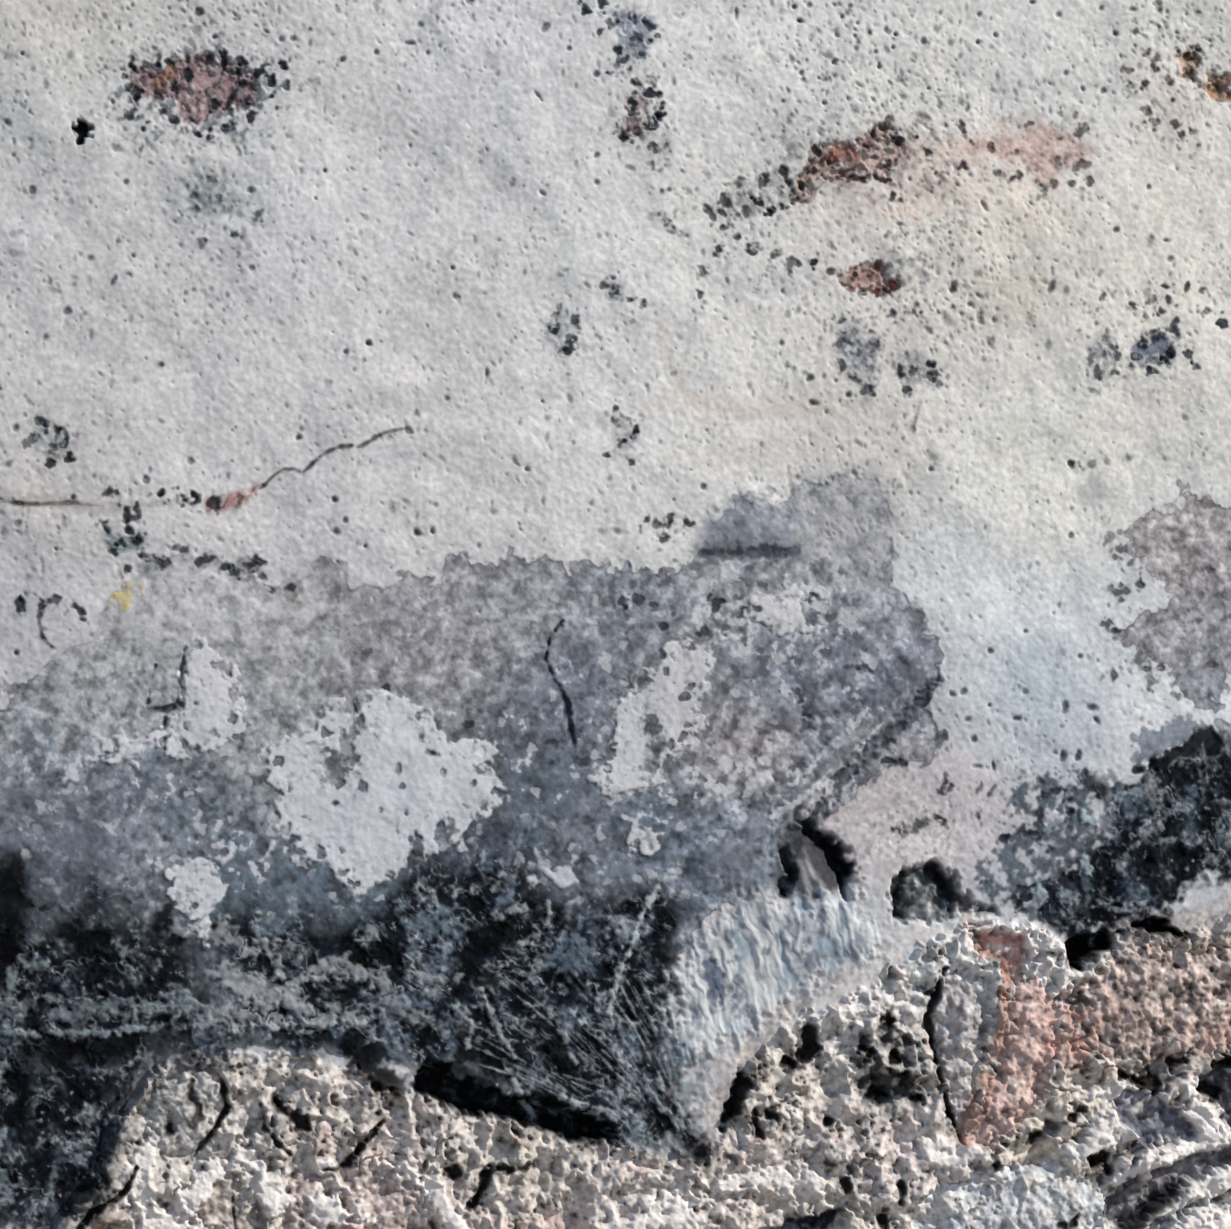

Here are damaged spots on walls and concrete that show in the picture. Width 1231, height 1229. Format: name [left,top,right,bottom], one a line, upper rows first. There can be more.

peeling [0,474,948,1083]
water stain [881,757,907,766]
water stain [890,815,947,837]
water stain [975,713,1231,945]
spalling [1064,916,1188,971]
crack [193,1080,230,1156]
crack [324,1119,384,1172]
water stain [0,814,880,1229]
spalling [344,1008,623,1146]
spalling [855,1010,926,1106]
crack [923,967,961,1139]
crack [76,1166,139,1229]